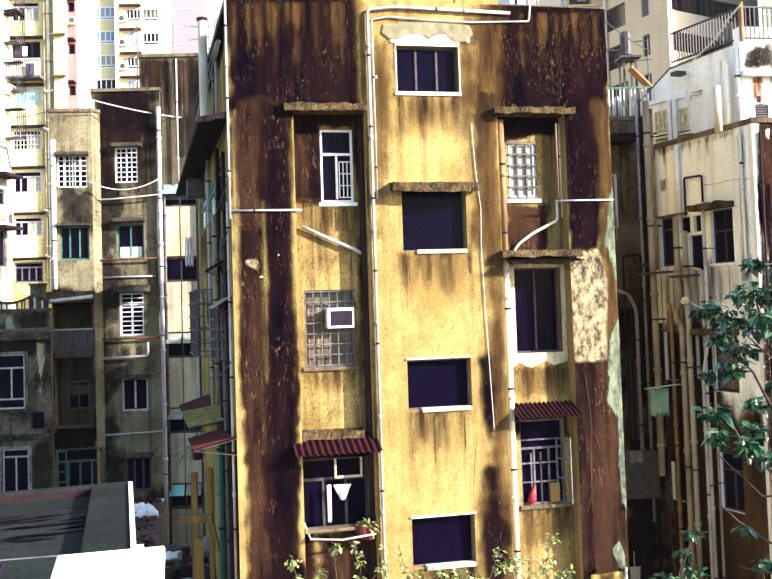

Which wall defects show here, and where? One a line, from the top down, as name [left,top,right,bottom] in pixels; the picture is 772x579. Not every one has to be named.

water stain [247,2,300,42]
water stain [331,0,362,56]
water stain [520,13,597,56]
water stain [744,43,772,70]
corrosion [752,77,772,100]
water stain [562,100,647,346]
peeling [14,282,36,298]
peeling [245,259,263,278]
water stain [358,4,564,579]
water stain [228,95,381,579]
water stain [574,360,630,579]
water stain [531,507,570,540]